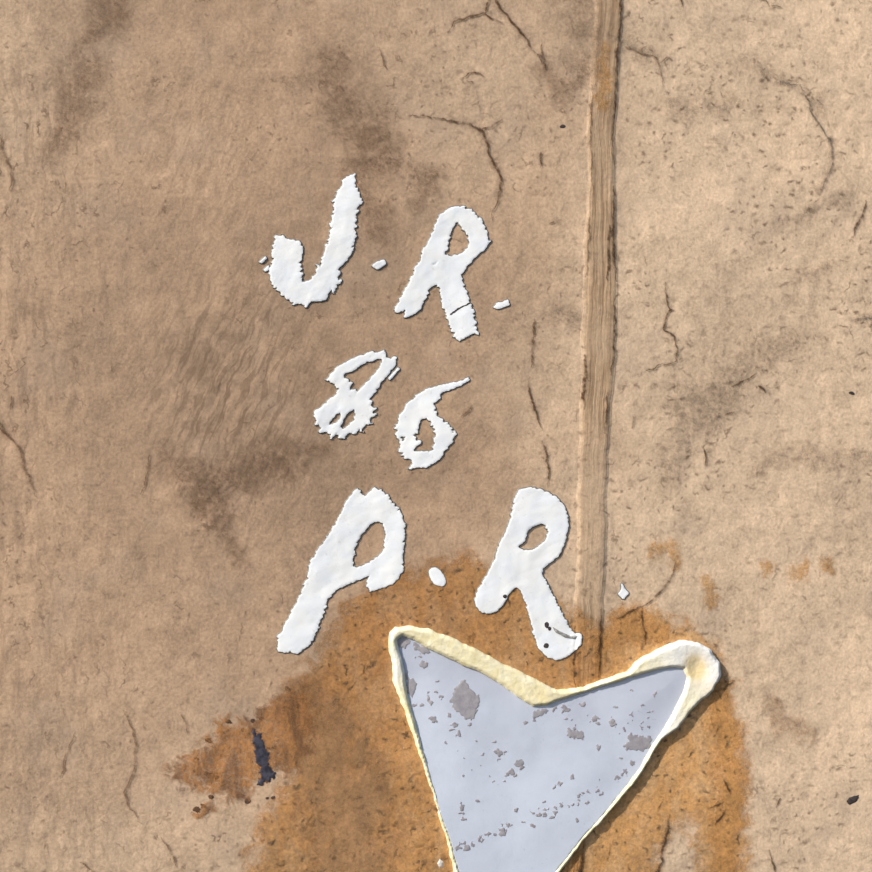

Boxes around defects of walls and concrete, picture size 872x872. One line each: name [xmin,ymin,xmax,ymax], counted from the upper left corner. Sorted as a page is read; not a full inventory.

crack [449,0,547,70]
crack [413,115,502,220]
crack [587,0,670,371]
crack [648,282,678,370]
crack [528,388,550,479]
peeling [398,636,431,669]
crack [598,563,676,676]
peeling [405,670,480,744]
rust [169,554,752,872]
peeling [489,759,524,783]
peeling [454,779,604,851]
peeling [523,702,656,780]